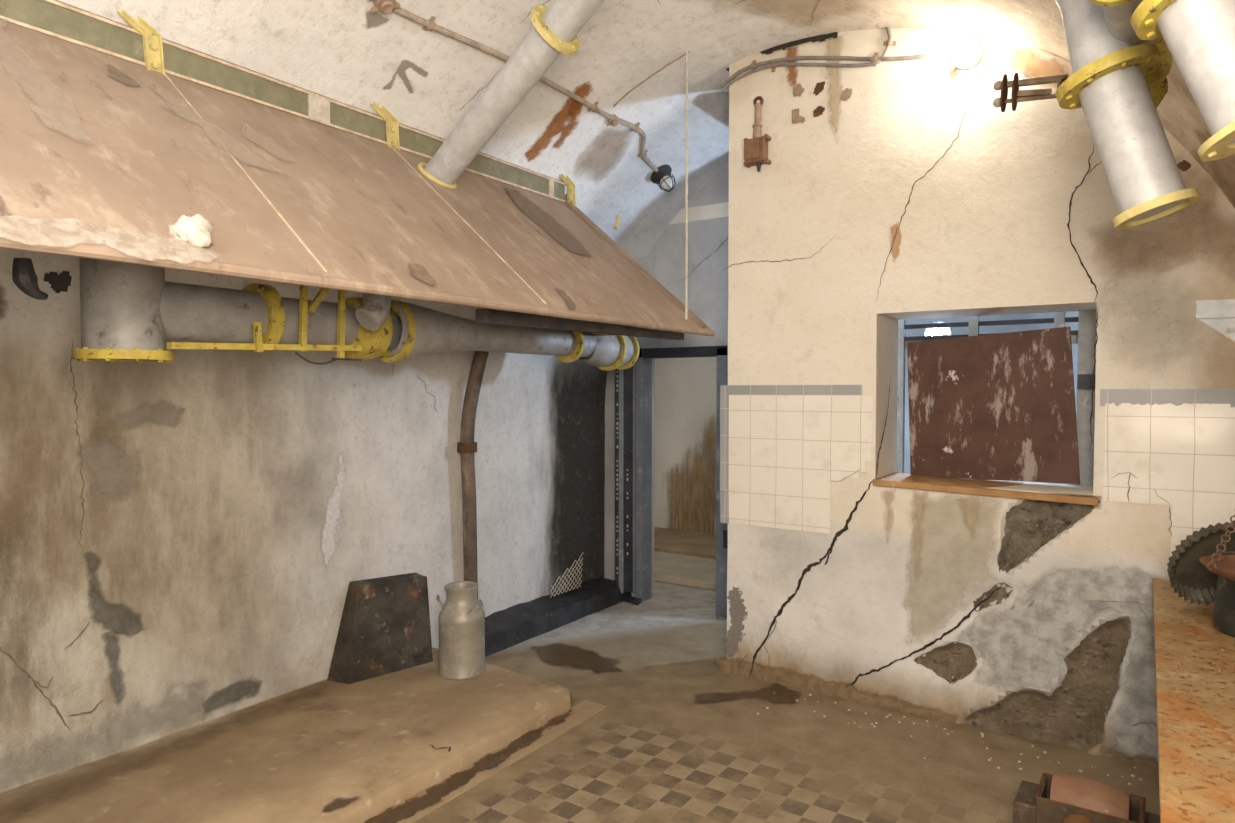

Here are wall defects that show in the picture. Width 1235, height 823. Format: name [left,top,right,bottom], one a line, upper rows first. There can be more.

rust [525,84,592,161]
crack [876,66,994,302]
crack [1067,145,1101,452]
crack [738,376,891,678]
spalling [973,495,1100,612]
damp [531,643,621,673]
peeling [725,587,748,657]
damp [695,659,956,724]
crack [844,584,1035,689]
spalling [914,641,977,685]
spalling [961,617,1132,752]
damp [1101,750,1159,769]